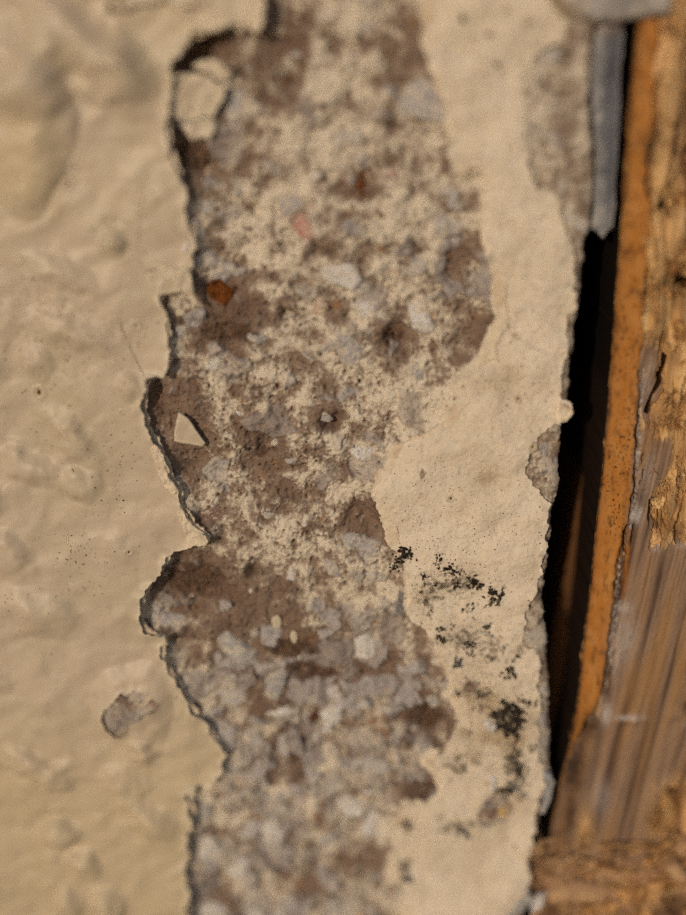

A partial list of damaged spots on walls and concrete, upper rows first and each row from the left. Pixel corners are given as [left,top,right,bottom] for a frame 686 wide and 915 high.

spalling [100,0,496,915]
leakage [389,546,538,813]
leakage [390,808,481,894]